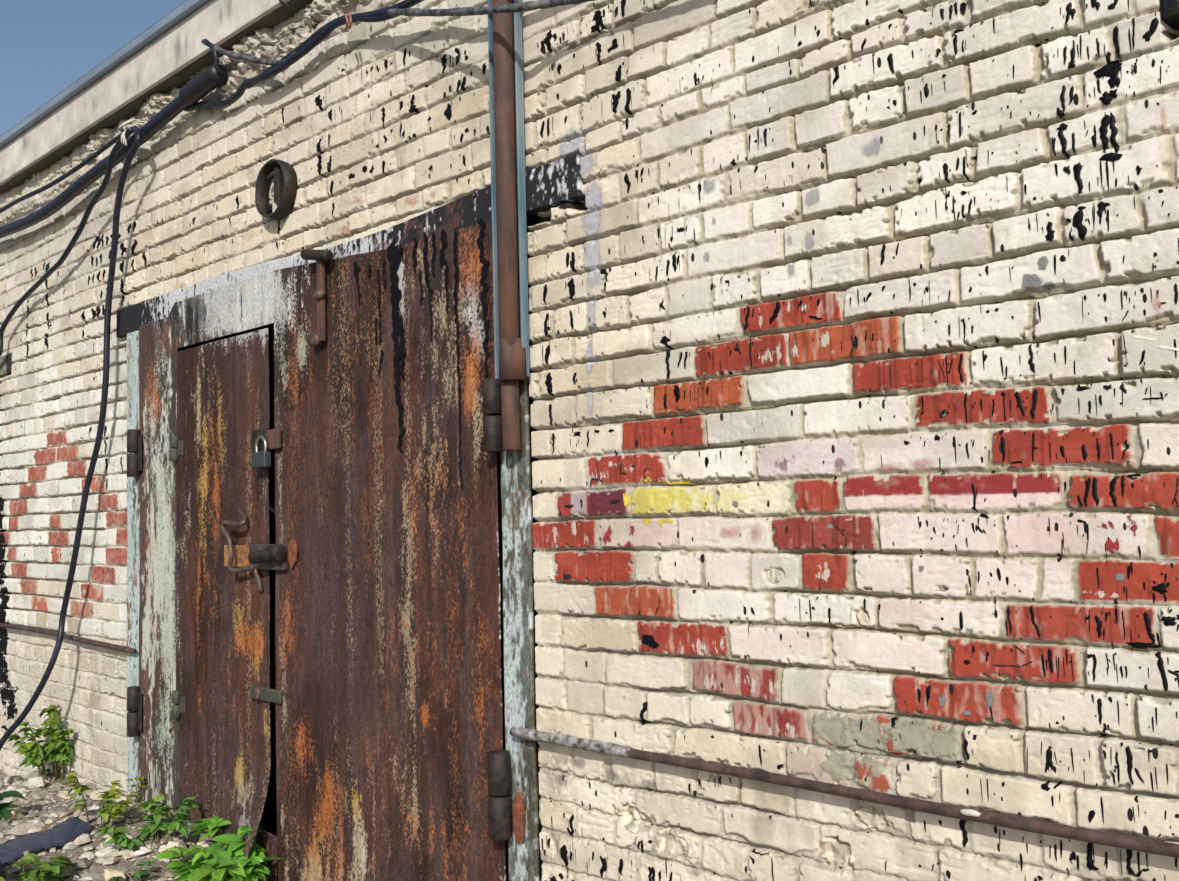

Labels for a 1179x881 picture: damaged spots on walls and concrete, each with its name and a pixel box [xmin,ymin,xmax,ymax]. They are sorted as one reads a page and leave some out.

peeling [883,729,911,756]
peeling [854,762,870,780]